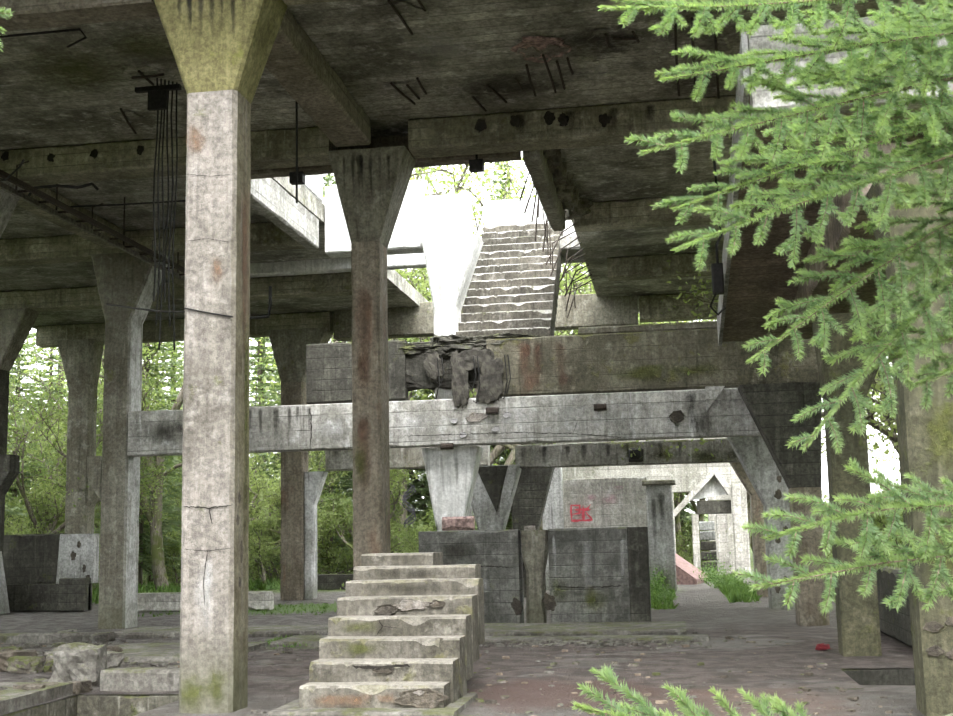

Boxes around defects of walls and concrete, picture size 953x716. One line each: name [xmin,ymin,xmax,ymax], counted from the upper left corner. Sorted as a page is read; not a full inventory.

water stain [178,0,235,27]
spalling [655,17,732,99]
spalling [468,54,619,132]
water stain [343,155,390,180]
crack [184,505,231,523]
crack [186,548,231,604]
spalling [373,600,445,615]
spalling [393,688,449,708]